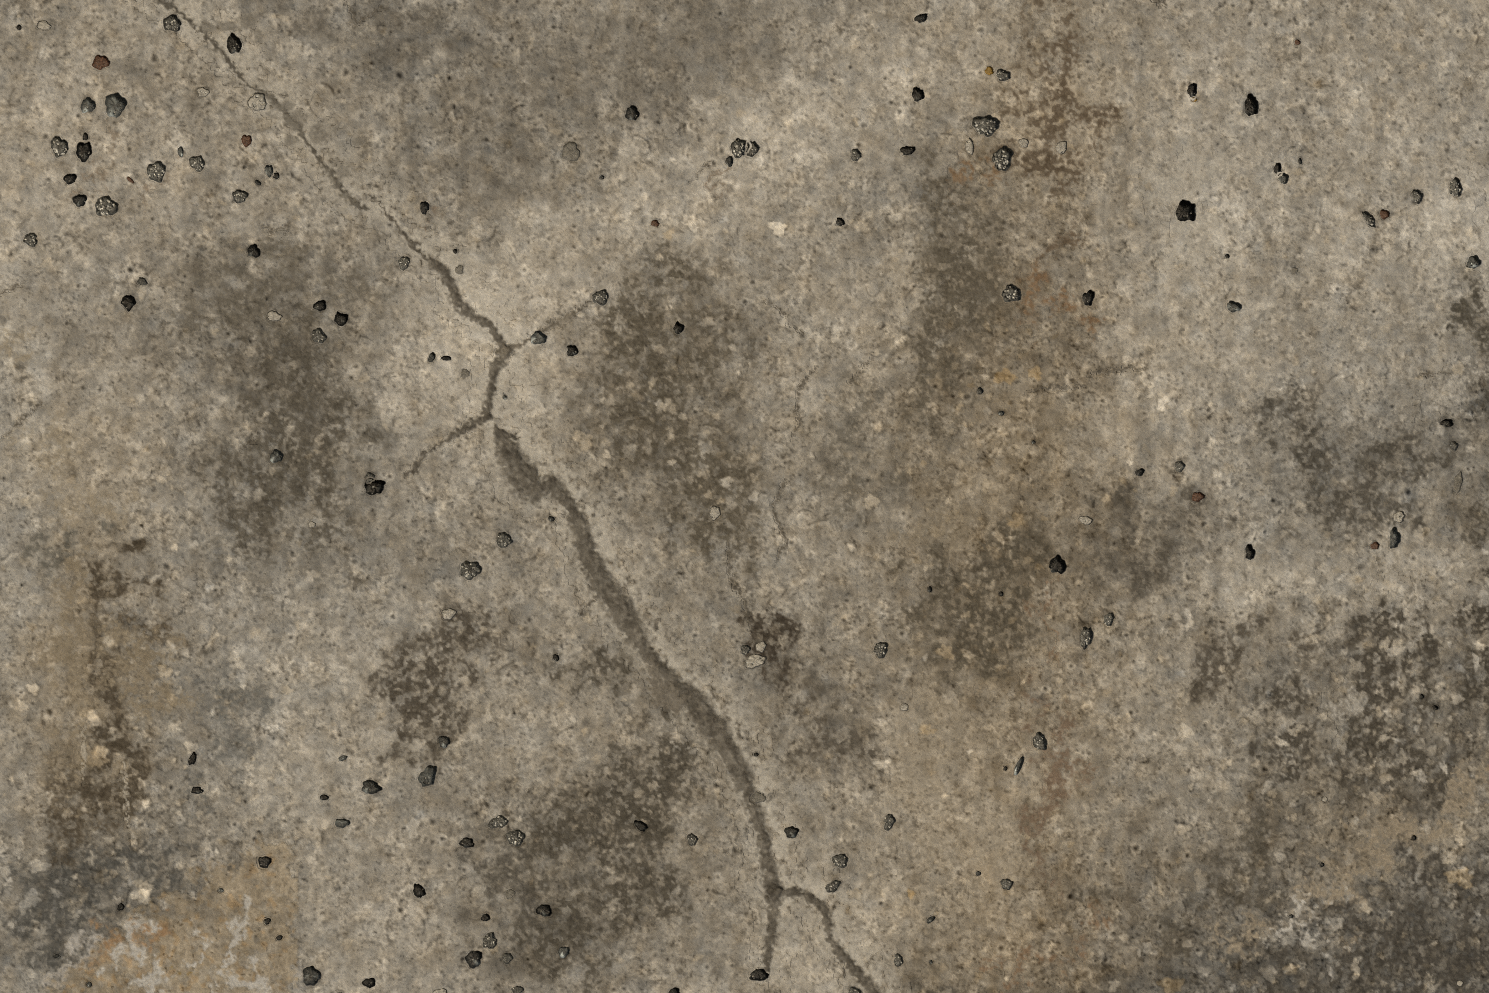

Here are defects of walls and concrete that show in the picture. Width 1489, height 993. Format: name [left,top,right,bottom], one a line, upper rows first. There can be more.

leakage [162,229,399,578]
crack [125,0,922,993]
leakage [571,240,770,583]
leakage [1251,165,1489,547]
leakage [1063,471,1489,993]